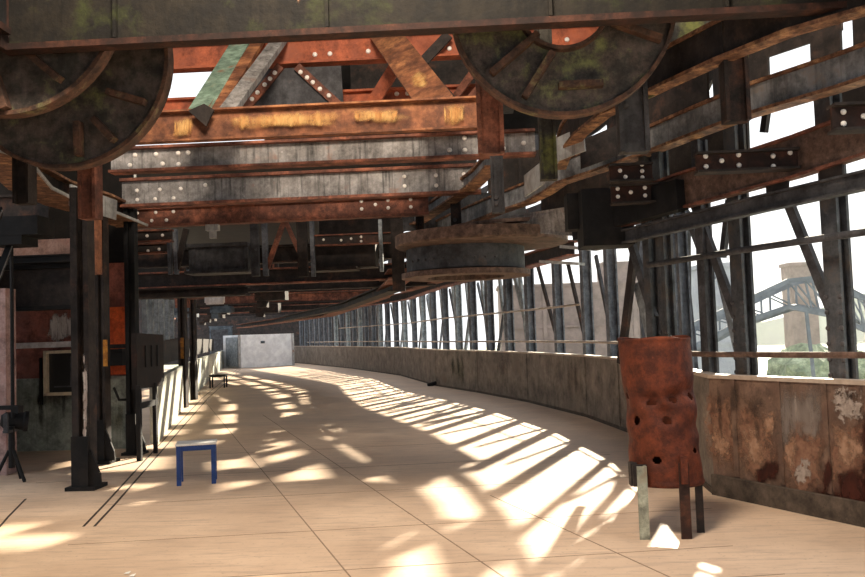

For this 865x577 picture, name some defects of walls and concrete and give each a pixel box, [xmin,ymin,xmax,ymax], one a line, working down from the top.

corrosion [233,113,332,128]
corrosion [355,111,397,121]
corrosion [444,107,463,123]
peeling [48,313,71,342]
peeling [833,384,863,424]
corrosion [704,395,865,502]